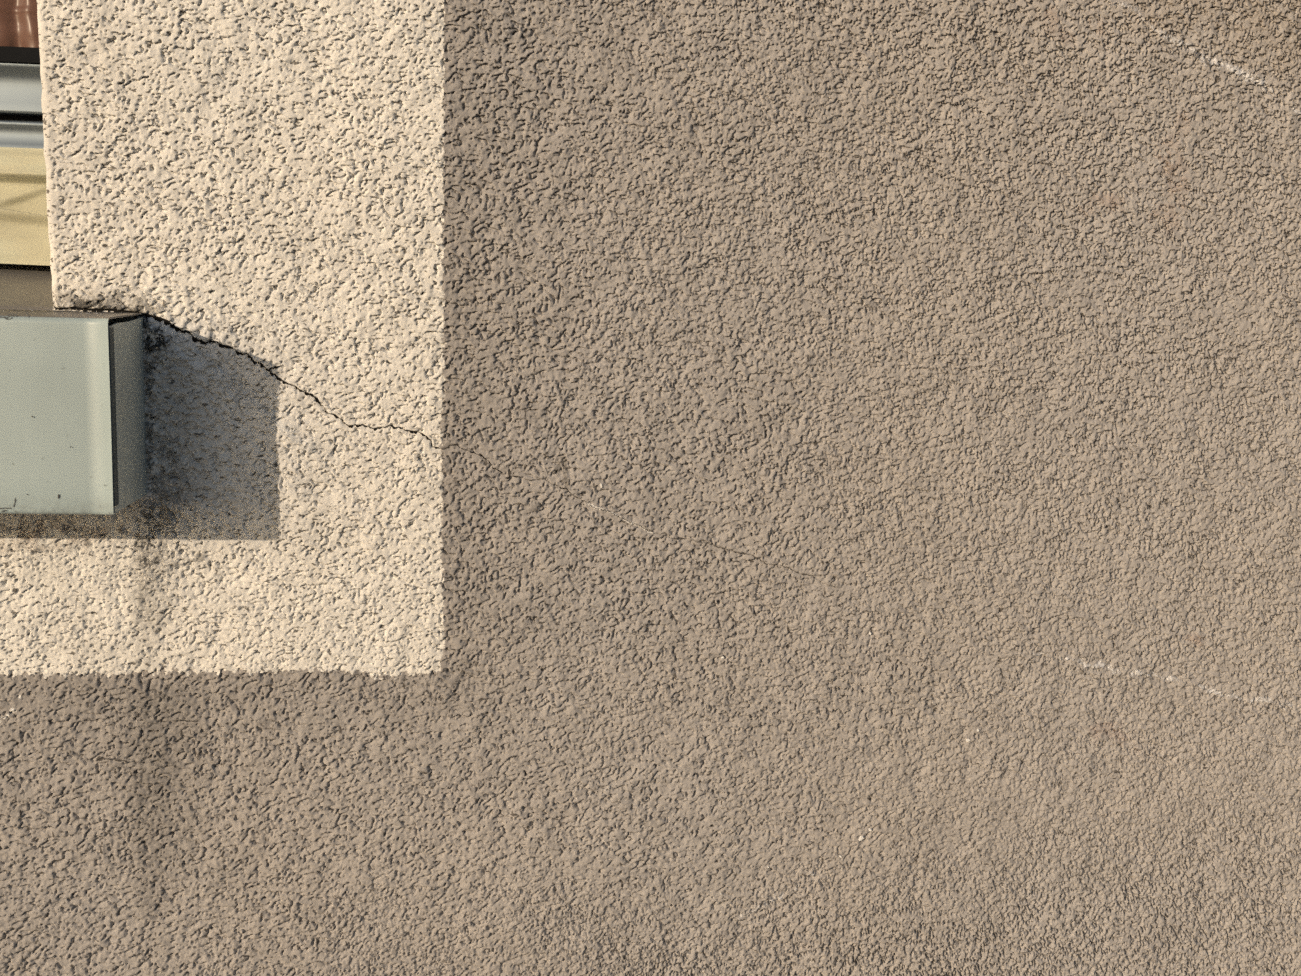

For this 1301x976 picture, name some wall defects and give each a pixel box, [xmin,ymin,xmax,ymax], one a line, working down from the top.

leakage [60,300,110,311]
leakage [129,309,170,350]
crack [0,295,834,587]